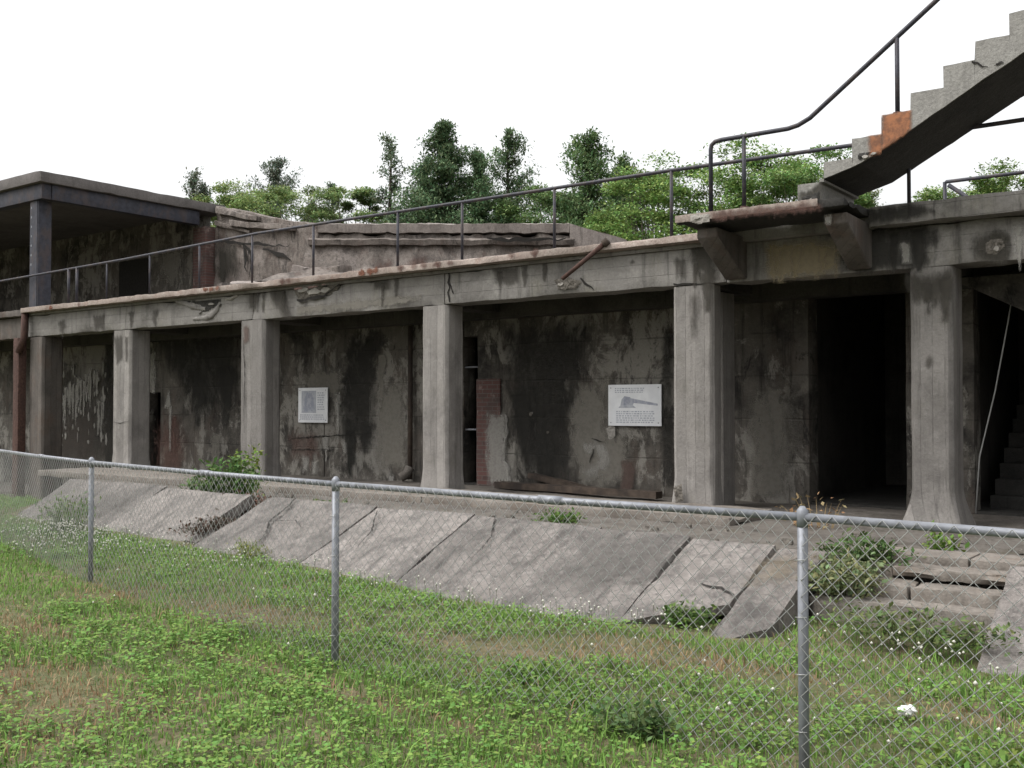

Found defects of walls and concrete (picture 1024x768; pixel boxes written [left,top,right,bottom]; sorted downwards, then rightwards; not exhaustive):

rust [869,110,911,153]
spalling [986,239,1005,255]
spalling [187,299,221,312]
crack [446,273,454,302]
peeling [62,361,110,466]
water stain [302,336,406,481]
water stain [508,324,634,489]
water stain [662,330,674,486]
crack [249,497,301,551]
crack [701,583,734,595]